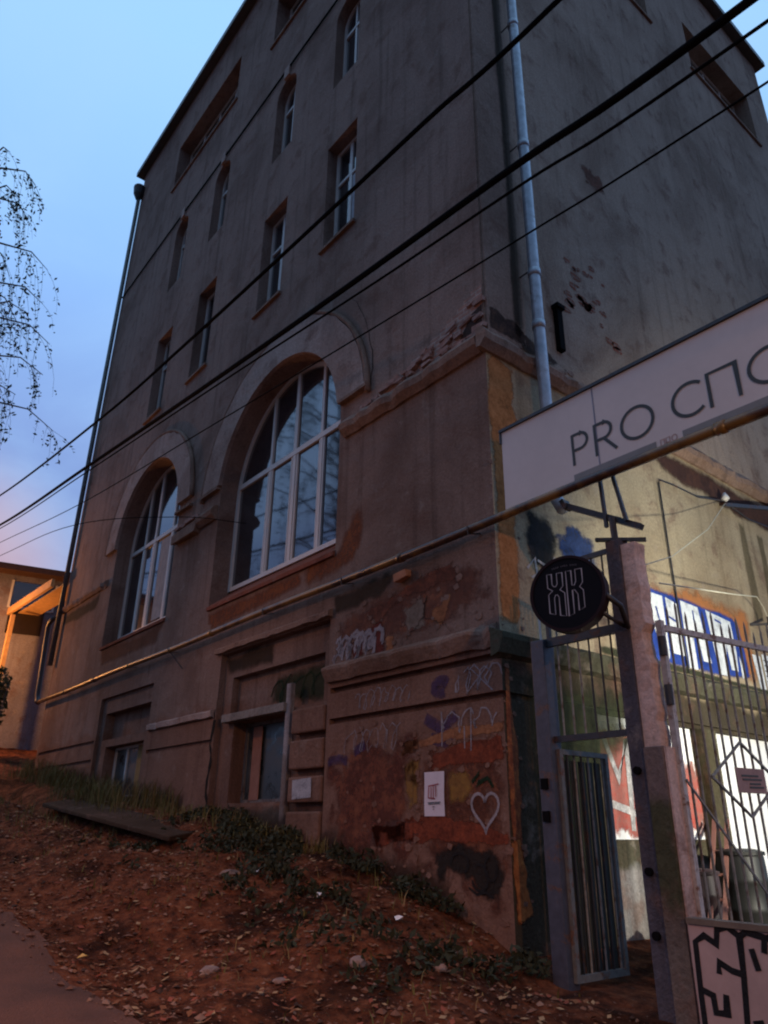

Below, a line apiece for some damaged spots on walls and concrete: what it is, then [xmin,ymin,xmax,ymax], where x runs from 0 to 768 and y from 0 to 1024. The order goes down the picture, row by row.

peeling [379,285,535,396]
flaking render [564,257,622,355]
flaking render [332,355,525,657]
flaking render [370,663,534,928]
water stain [313,833,504,909]